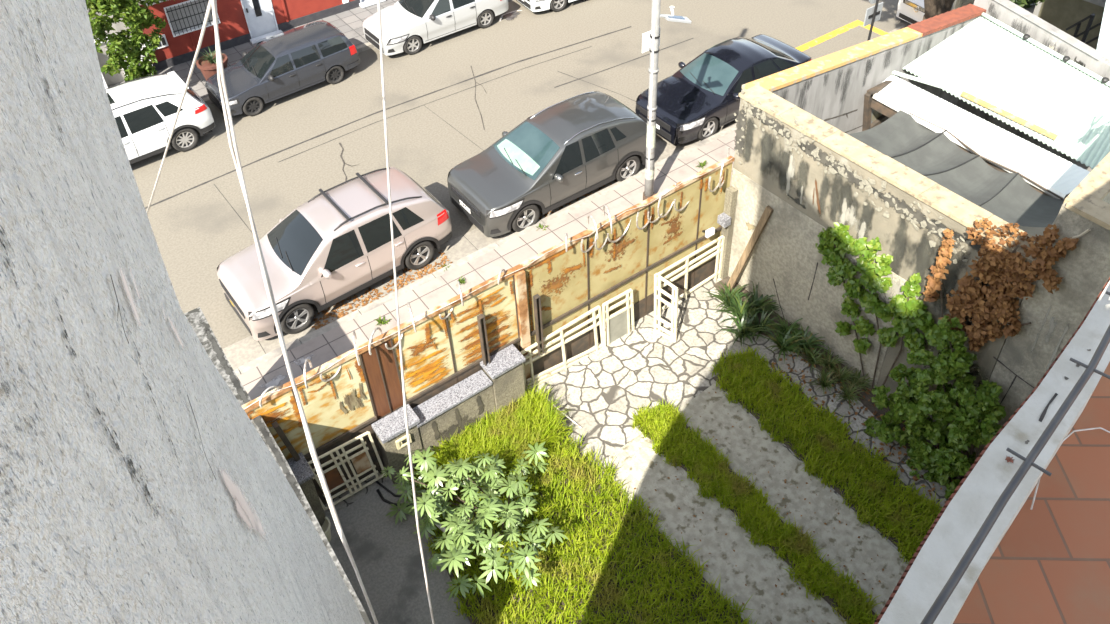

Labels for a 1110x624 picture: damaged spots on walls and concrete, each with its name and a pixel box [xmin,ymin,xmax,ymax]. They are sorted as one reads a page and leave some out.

rust [346,360,366,383]
rust [394,281,513,394]
rust [527,228,635,338]
rust [644,192,683,245]
water stain [743,117,882,239]
peeling [734,90,968,264]
water stain [874,218,982,317]